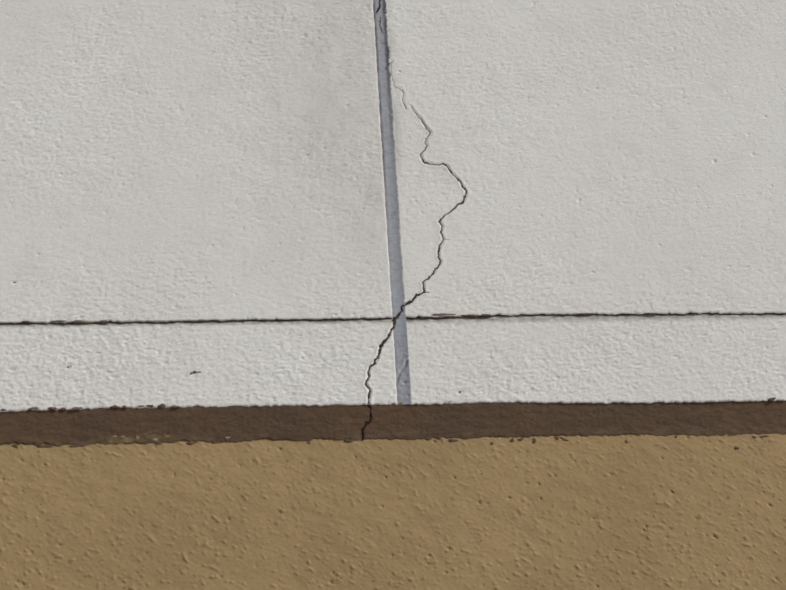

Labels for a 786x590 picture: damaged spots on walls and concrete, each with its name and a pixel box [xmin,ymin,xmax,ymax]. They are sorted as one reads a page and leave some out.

crack [361,0,468,441]